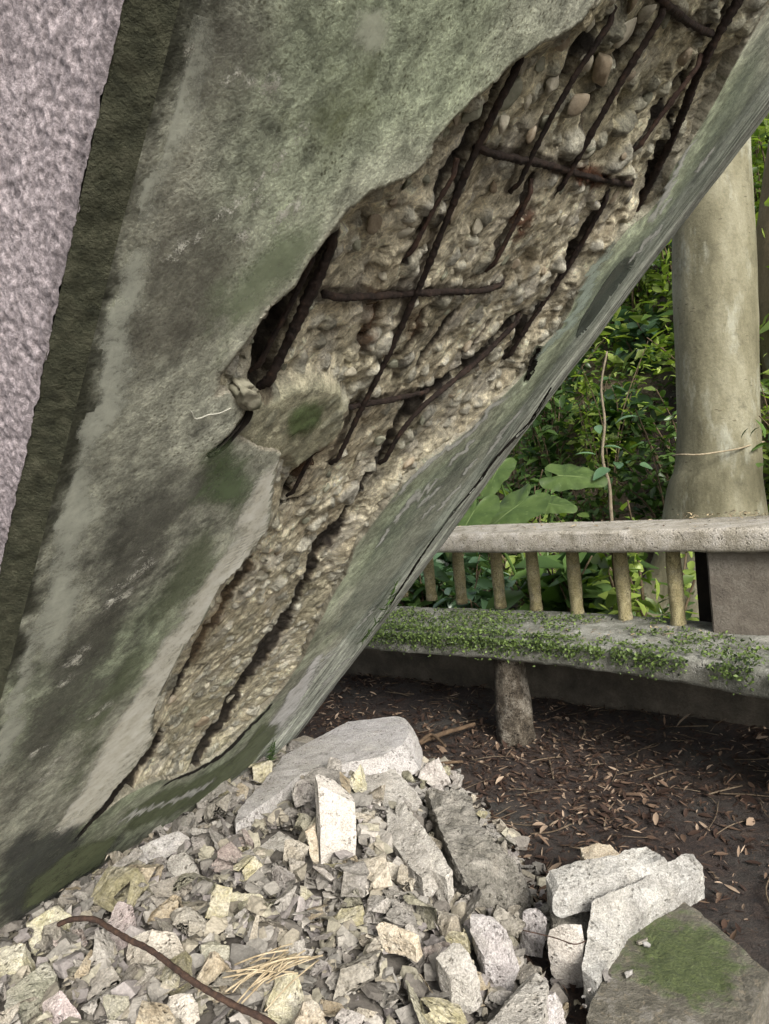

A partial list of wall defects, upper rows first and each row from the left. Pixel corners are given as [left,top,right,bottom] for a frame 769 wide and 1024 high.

damp [0,251,198,800]
damp [0,460,279,924]
efflorescence [139,29,207,211]
crack [164,703,273,786]
damp [269,655,322,737]
spalling [122,0,769,788]
corrosion [248,0,744,465]